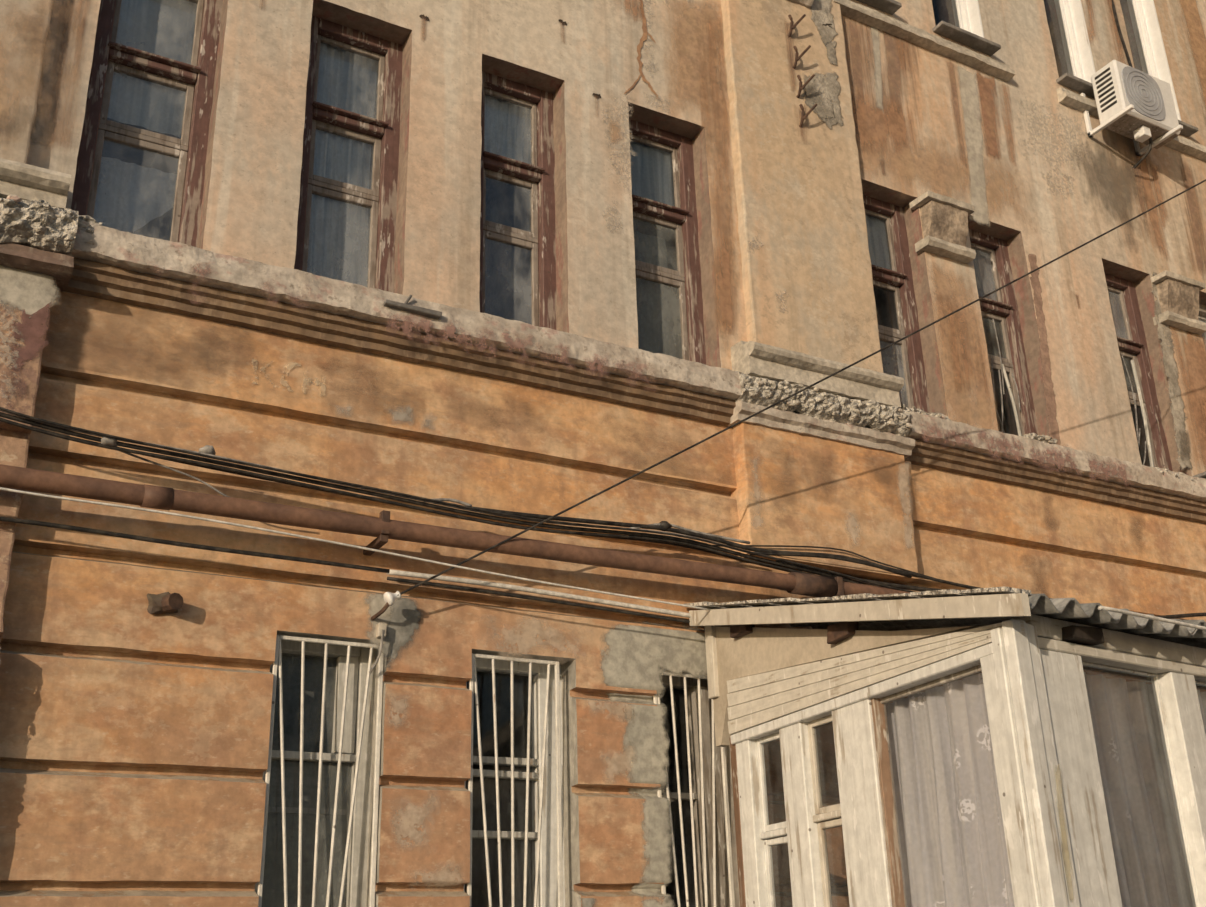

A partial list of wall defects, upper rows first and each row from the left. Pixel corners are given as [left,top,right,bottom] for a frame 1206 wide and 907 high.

crack [624,0,660,100]
spalling [804,0,843,129]
water stain [844,18,1017,223]
spalling [0,194,102,256]
spalling [735,254,1127,483]
peeling [365,593,392,644]